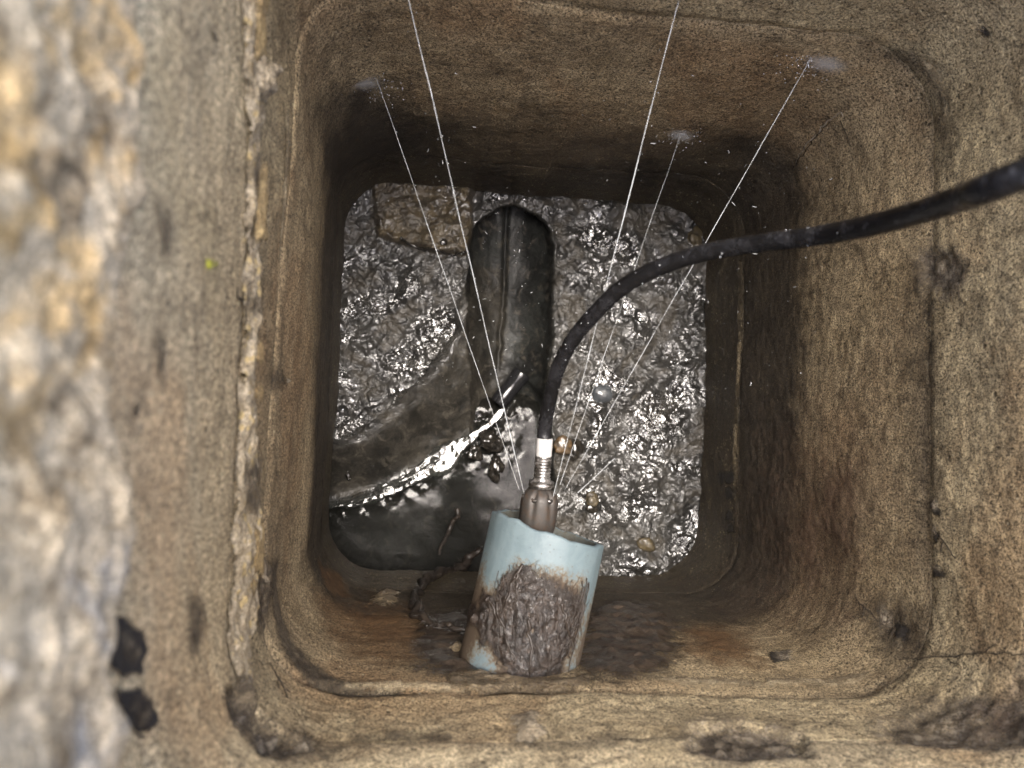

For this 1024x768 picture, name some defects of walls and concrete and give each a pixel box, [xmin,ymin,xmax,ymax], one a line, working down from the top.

crack [899,644,1024,668]